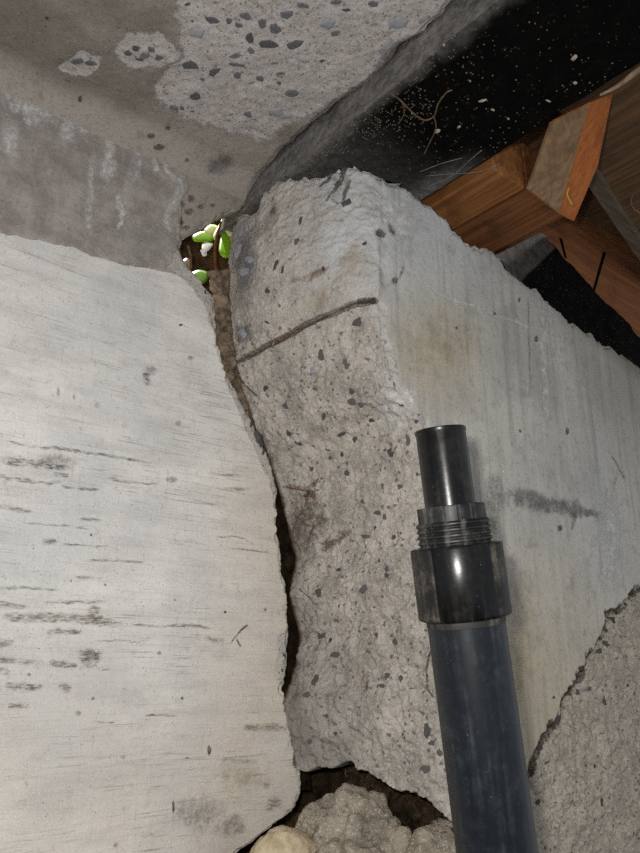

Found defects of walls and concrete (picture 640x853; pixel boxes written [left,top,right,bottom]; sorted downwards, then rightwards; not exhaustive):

crack [206,269,377,452]
damp [377,381,420,429]
crack [234,483,299,696]
crack [300,771,312,790]
spalling [527,585,640,853]